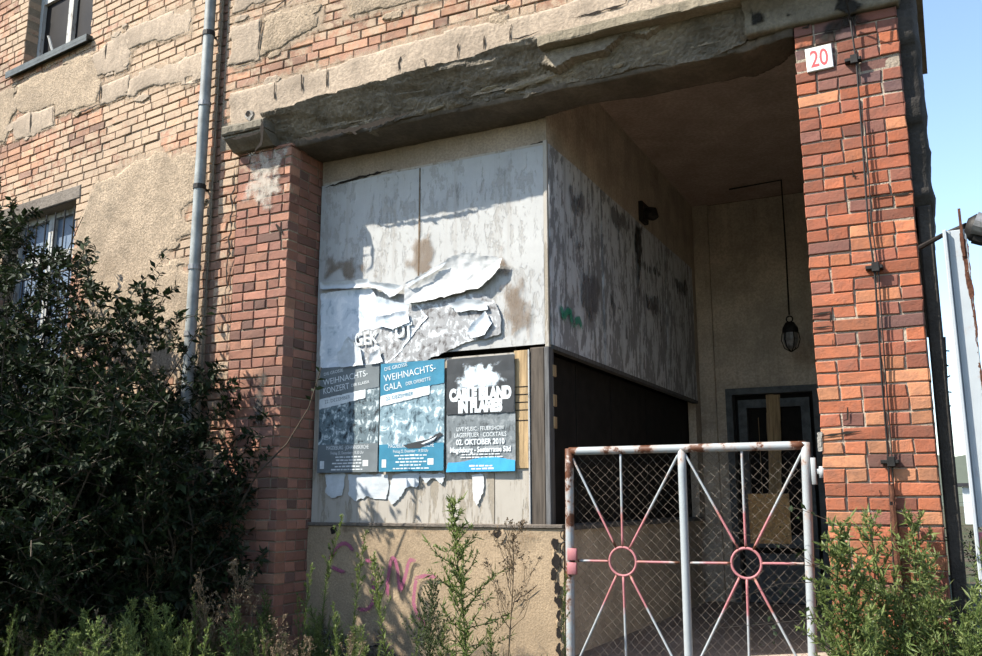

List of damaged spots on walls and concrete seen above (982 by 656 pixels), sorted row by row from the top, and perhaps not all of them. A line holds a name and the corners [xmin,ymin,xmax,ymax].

flaking render [0,5,202,145]
spalling [227,0,748,145]